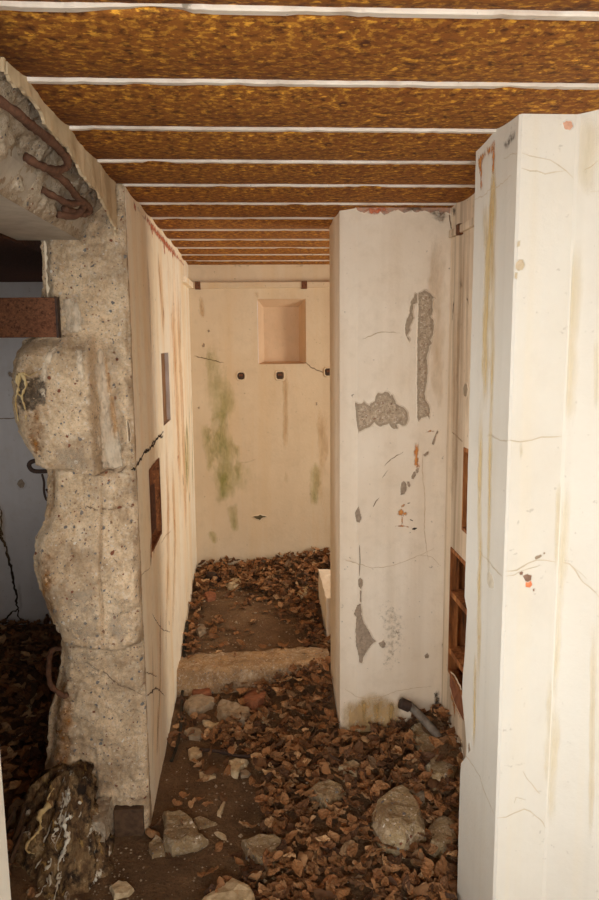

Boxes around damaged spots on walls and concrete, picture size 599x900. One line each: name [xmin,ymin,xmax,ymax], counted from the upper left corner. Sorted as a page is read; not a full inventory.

spalling [0,56,118,241]
corrosion [478,143,495,187]
spalling [354,289,436,433]
crack [96,431,164,476]
crack [488,434,561,442]
spalling [353,577,387,664]
crack [85,662,164,696]
damp [347,700,398,732]